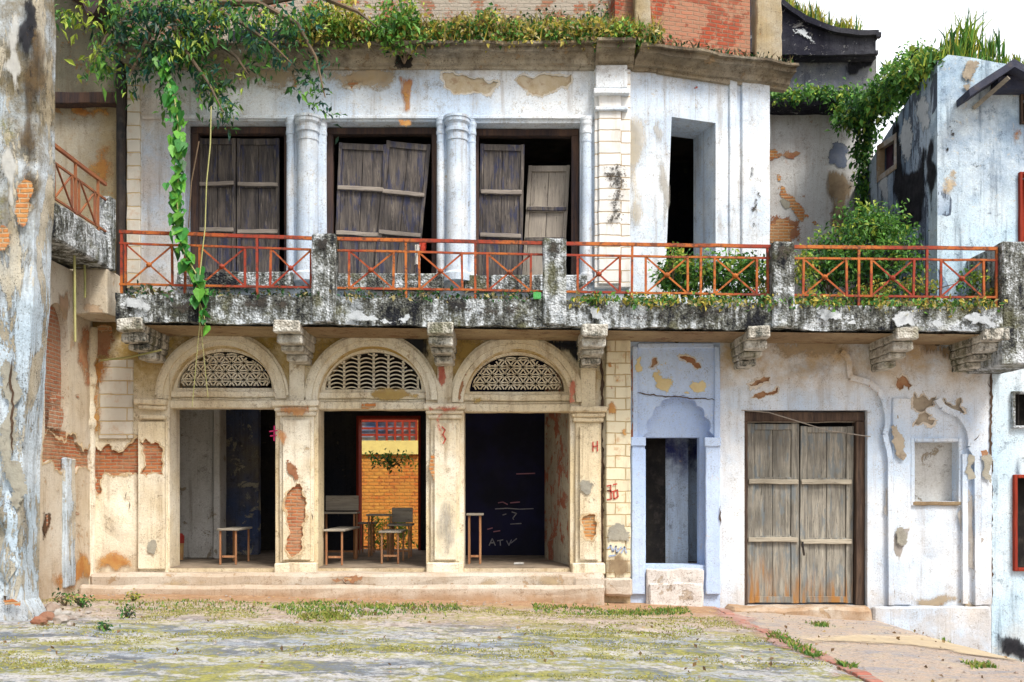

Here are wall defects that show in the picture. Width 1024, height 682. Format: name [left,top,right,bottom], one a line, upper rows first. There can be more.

peeling [5,15,21,84]
water stain [1,0,47,155]
peeling [439,70,501,97]
peeling [514,72,574,98]
flaking render [0,147,34,250]
water stain [24,169,38,195]
flaking render [770,149,800,161]
flaking render [770,174,816,243]
water stain [892,123,956,235]
flaking render [42,392,165,497]
peeling [891,373,967,460]
flaking render [282,460,309,559]